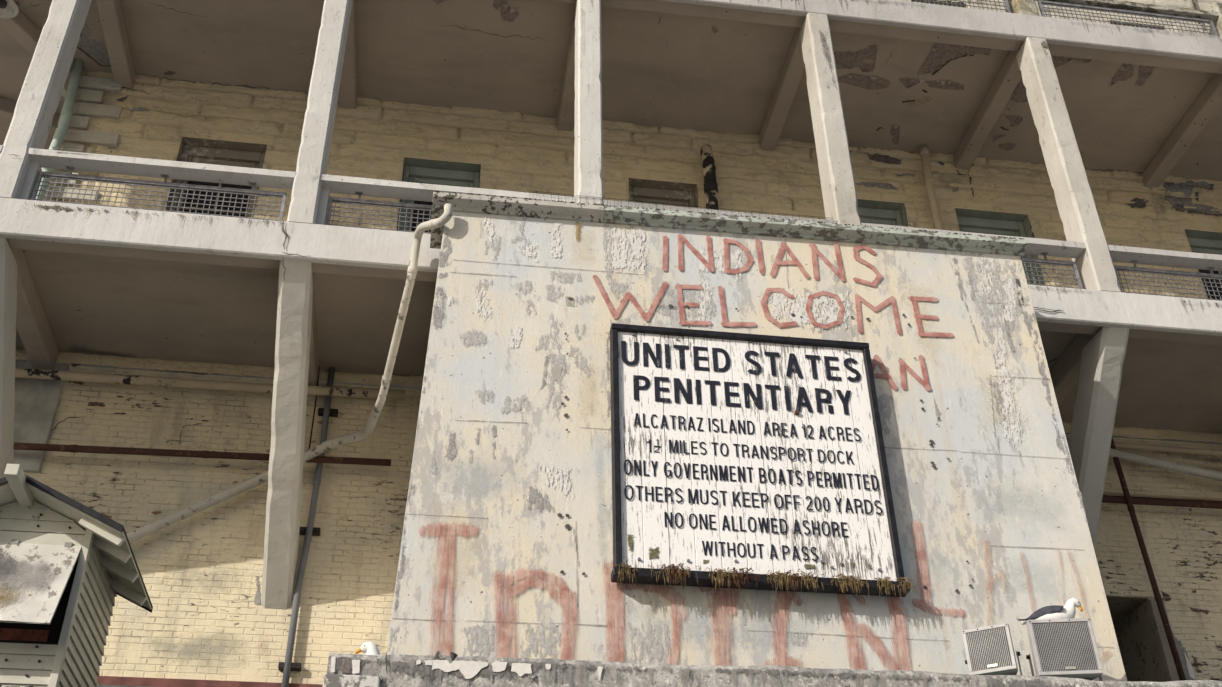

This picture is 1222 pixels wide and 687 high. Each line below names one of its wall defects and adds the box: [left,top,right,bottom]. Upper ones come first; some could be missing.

peeling [834,43,991,90]
peeling [983,84,1028,151]
peeling [1126,198,1149,208]
peeling [1163,181,1222,216]
crack [282,221,307,281]
peeling [330,656,368,674]